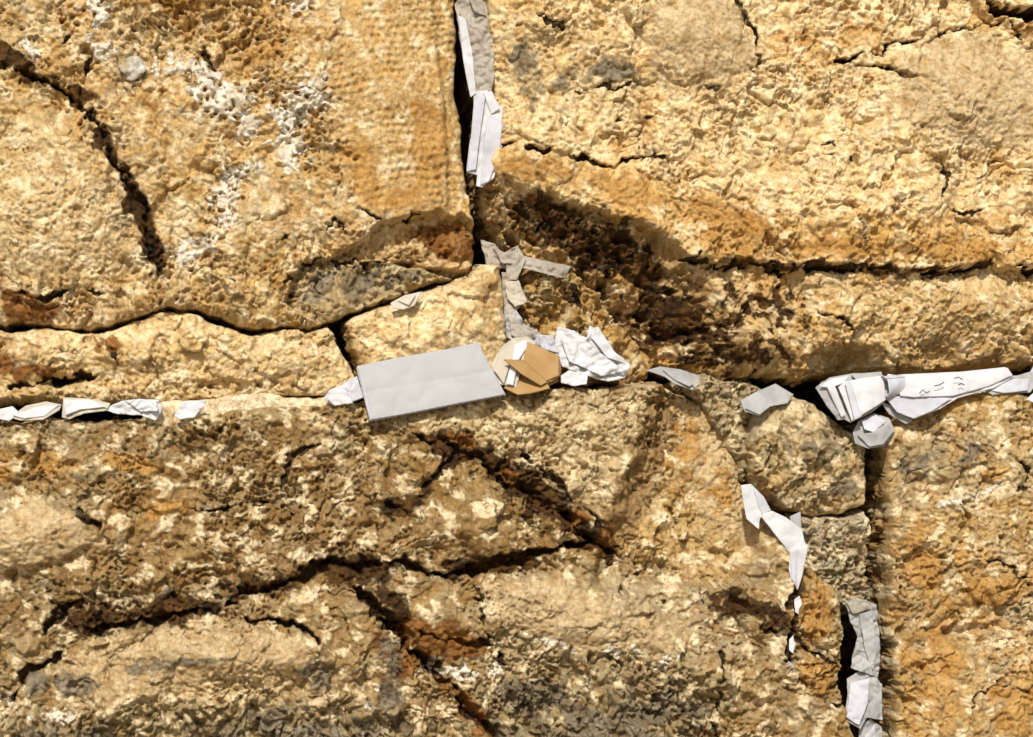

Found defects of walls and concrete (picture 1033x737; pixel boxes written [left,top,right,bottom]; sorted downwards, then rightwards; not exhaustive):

crack [734,0,762,73]
crack [833,0,1033,77]
crack [0,57,100,127]
crack [574,81,632,95]
crack [109,161,150,209]
crack [501,141,666,168]
crack [385,434,505,506]
crack [389,448,616,671]
crack [13,599,84,700]
crack [90,617,166,637]
crack [225,556,340,646]
crack [353,586,505,737]